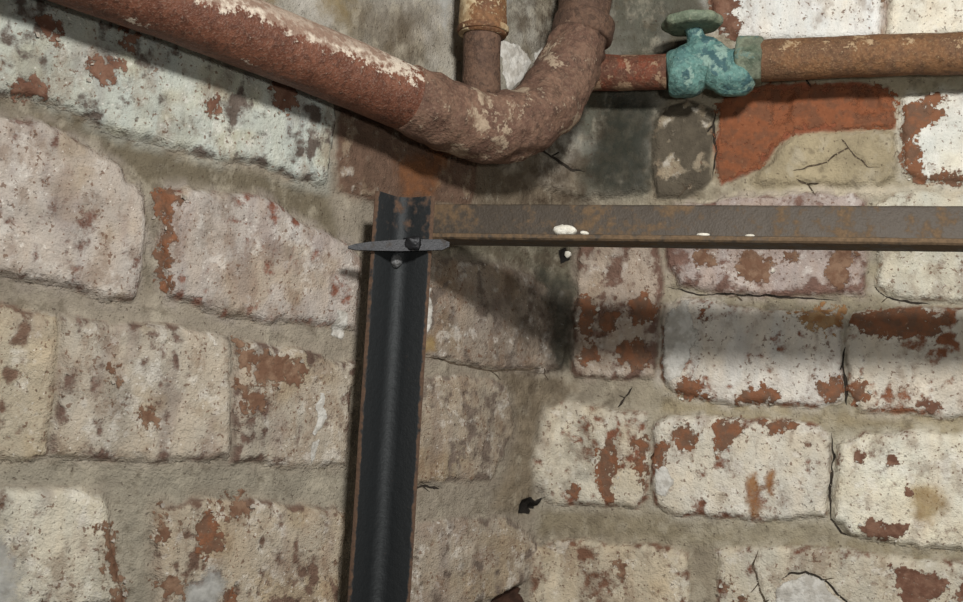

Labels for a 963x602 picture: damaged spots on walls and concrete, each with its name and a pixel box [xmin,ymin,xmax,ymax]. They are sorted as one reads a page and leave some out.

crack [793,140,868,194]
spalling [710,81,963,189]
peeling [149,187,188,293]
peeling [574,285,661,373]
peeling [782,301,951,343]
peeling [709,381,800,460]
peeling [814,373,873,407]
peeling [593,419,699,504]
crack [828,433,849,536]
peeling [194,488,256,562]
crack [751,552,769,602]
crack [783,571,848,602]